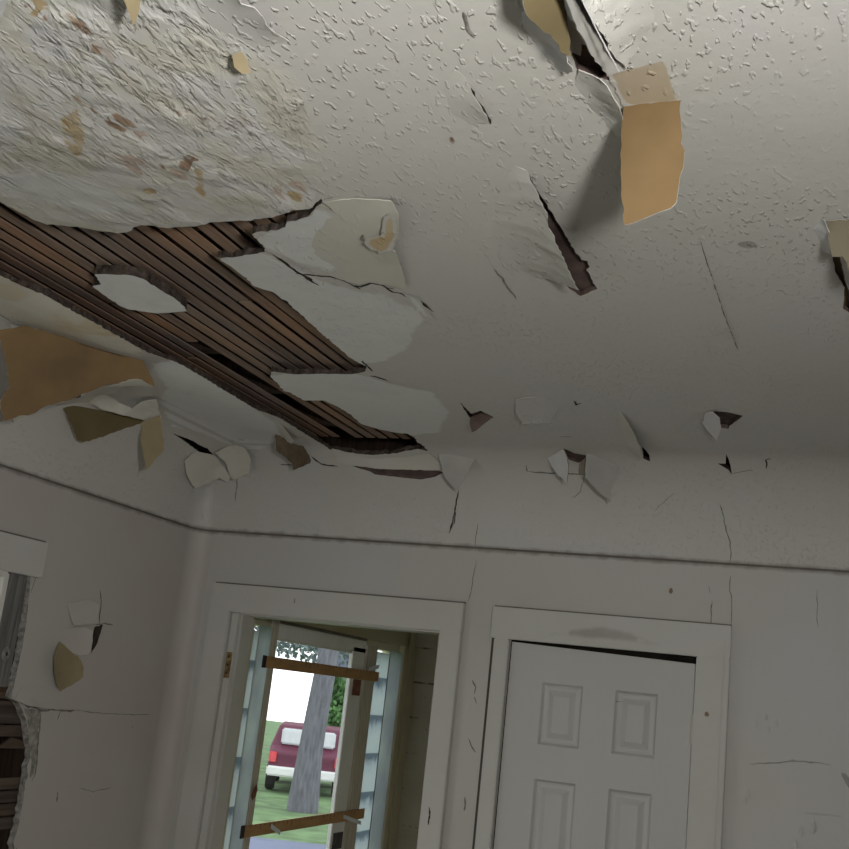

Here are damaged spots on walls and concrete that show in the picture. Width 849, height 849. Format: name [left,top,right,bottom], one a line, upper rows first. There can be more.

peeling [521,0,685,225]
peeling [0,198,454,489]
peeling [490,166,597,296]
crack [701,243,738,349]
peeling [814,218,849,312]
crack [449,490,459,533]
peeling [547,449,586,483]
peeling [702,411,742,441]
peeling [54,592,112,691]
spalling [2,576,41,849]
crack [15,684,152,718]
crack [752,758,829,766]